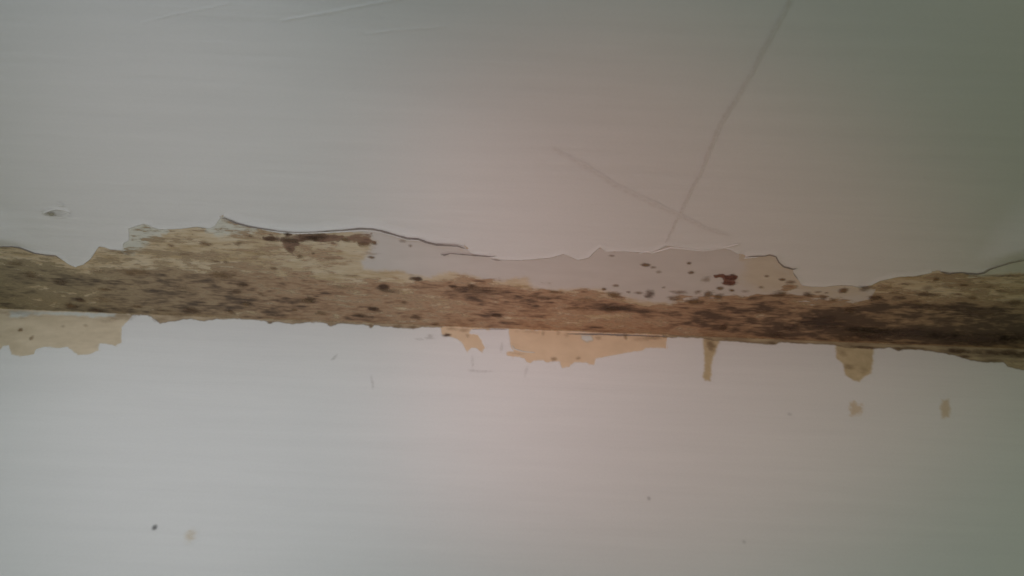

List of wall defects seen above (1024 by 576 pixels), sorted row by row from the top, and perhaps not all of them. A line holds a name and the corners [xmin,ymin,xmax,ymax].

leakage [0,221,1024,349]
peeling [0,210,1024,386]